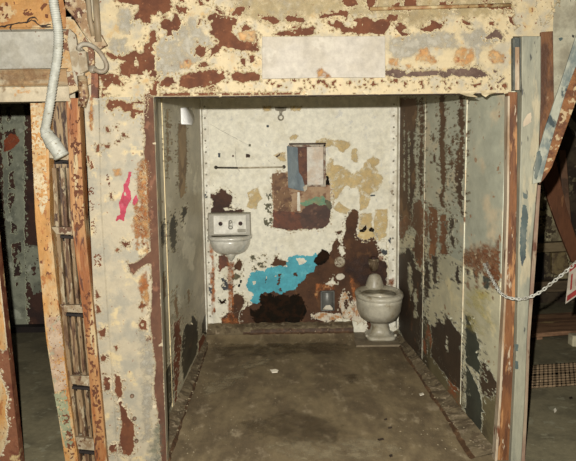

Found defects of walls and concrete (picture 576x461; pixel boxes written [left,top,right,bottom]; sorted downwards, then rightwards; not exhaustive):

peeling [0,103,48,354]
peeling [70,117,130,230]
rust [125,87,302,461]
peeling [98,0,520,446]
rust [464,240,499,290]
peeling [46,316,75,459]
peeling [82,287,140,461]